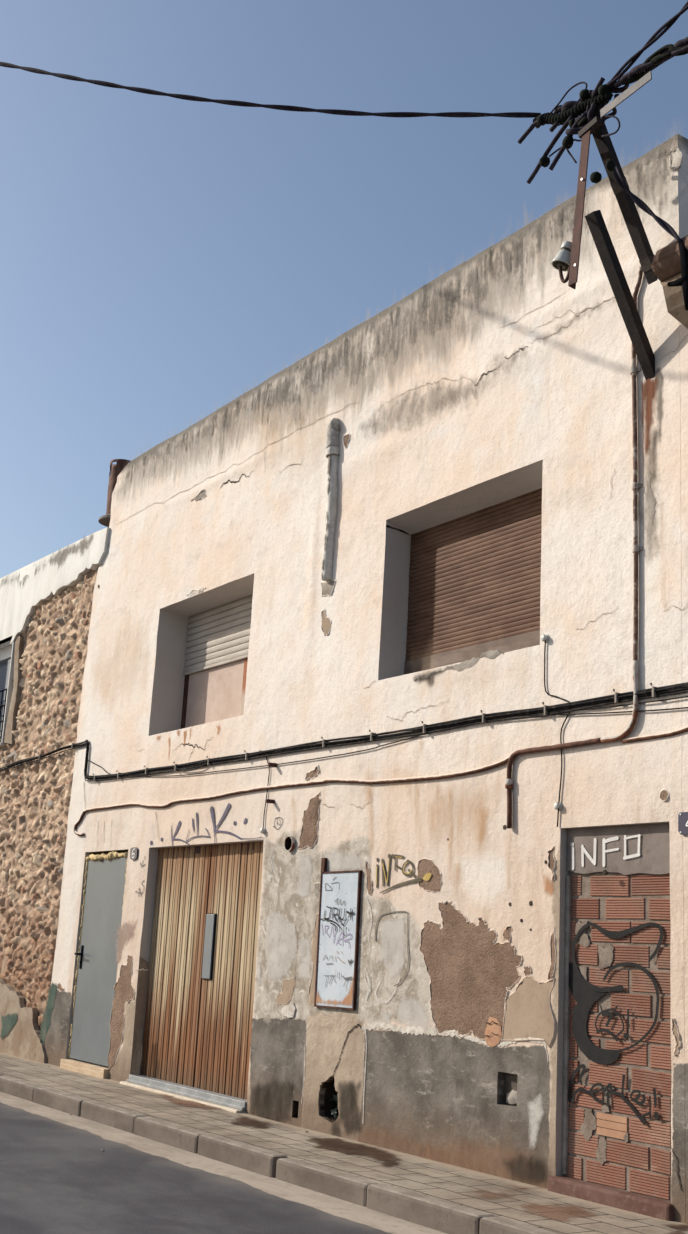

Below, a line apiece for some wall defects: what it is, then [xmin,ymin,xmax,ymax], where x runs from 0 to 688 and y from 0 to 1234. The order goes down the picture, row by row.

leakage [126,203,587,479]
crack [100,288,615,565]
rust [642,378,657,452]
leakage [643,368,663,549]
spalling [320,522,337,636]
spalling [298,765,321,850]
spalling [107,954,149,1075]
spalling [362,857,557,1110]
spalling [320,1078,339,1123]
leakage [308,1083,398,1167]
leakage [509,1159,545,1182]
leakage [529,1097,543,1144]